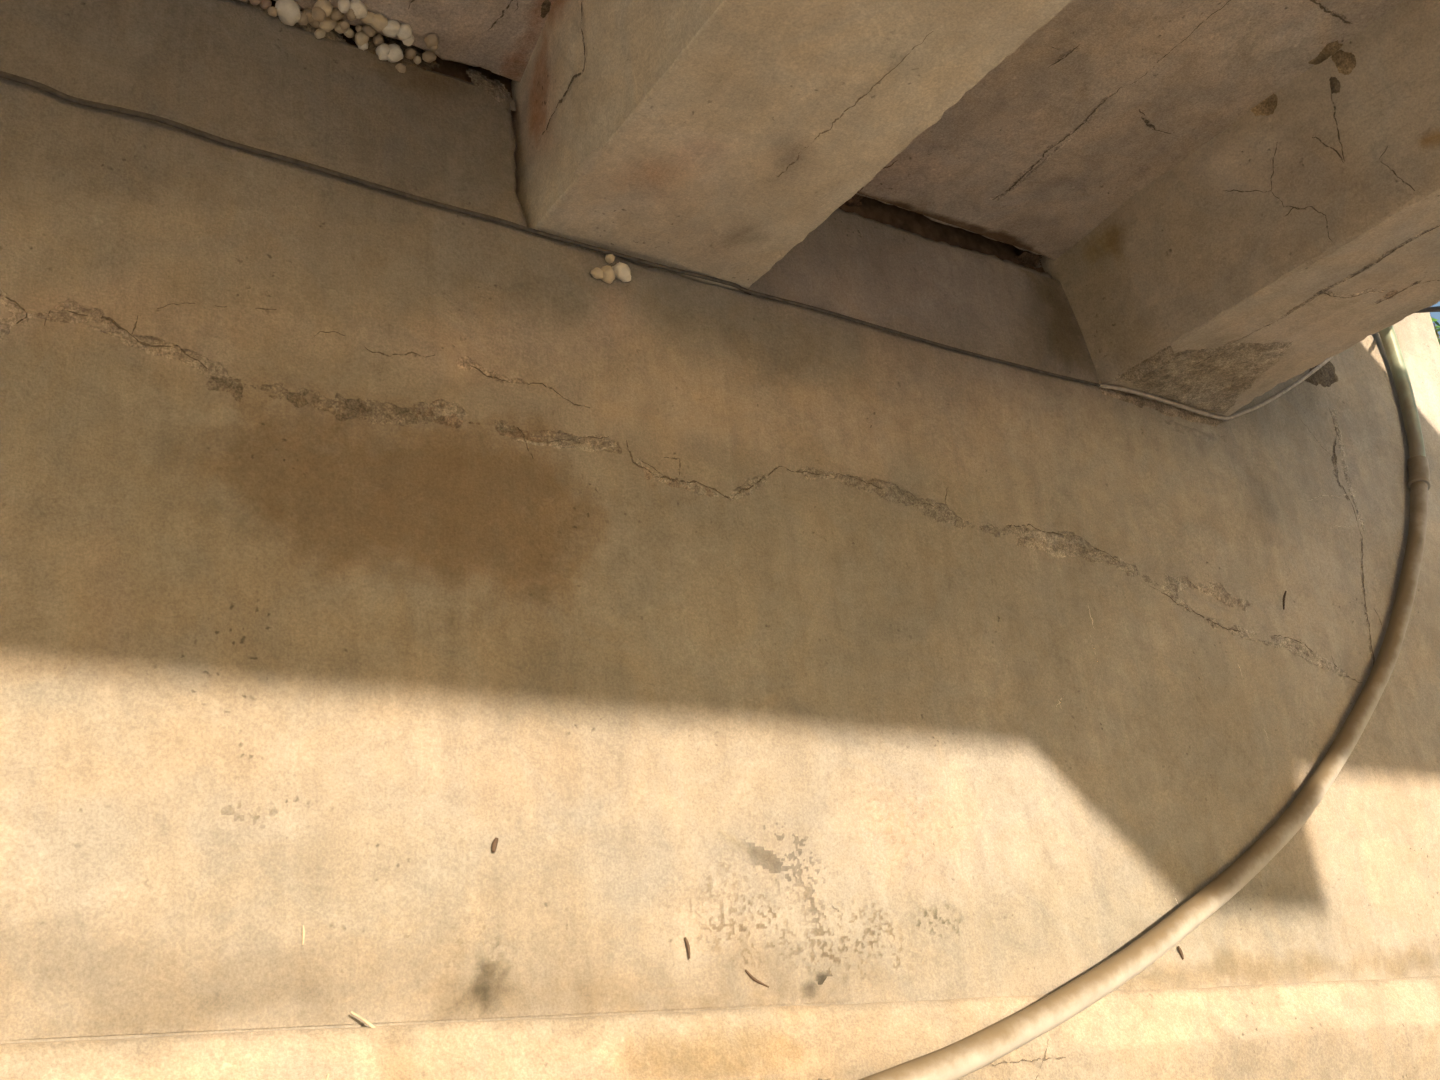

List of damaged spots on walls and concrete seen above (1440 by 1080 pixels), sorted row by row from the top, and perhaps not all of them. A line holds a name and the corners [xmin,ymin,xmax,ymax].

crack [777,31,933,177]
crack [989,0,1231,201]
crack [1226,148,1332,241]
crack [1312,95,1344,163]
crack [1192,225,1440,366]
water stain [137,358,624,664]
crack [0,287,1382,683]